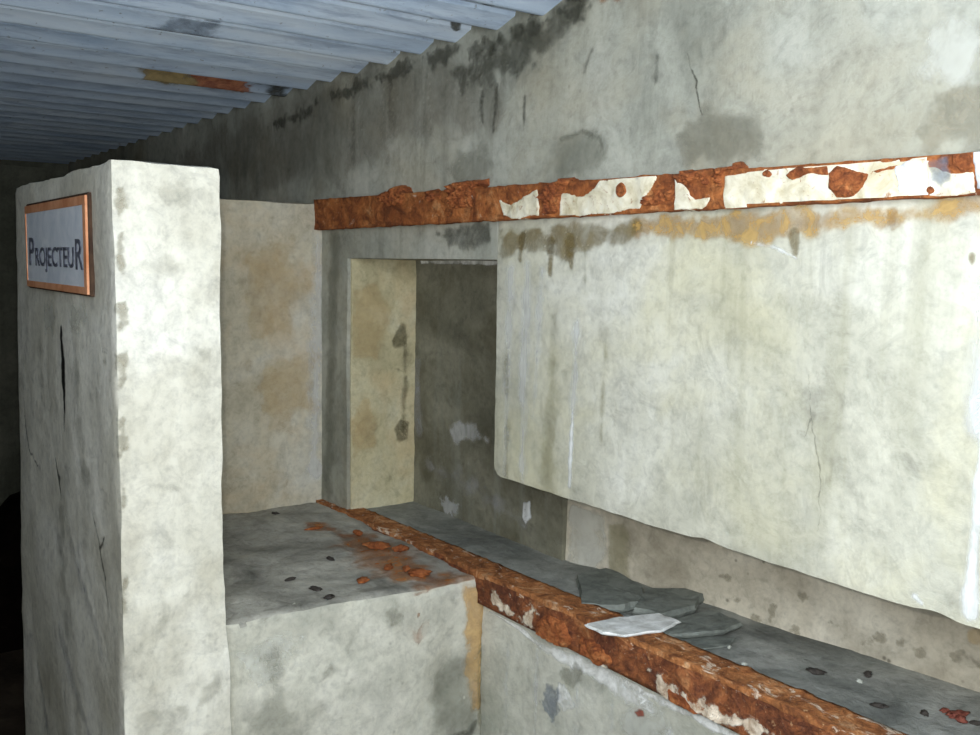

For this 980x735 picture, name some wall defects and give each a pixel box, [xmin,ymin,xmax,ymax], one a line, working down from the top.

rust [143,69,251,93]
peeling [499,190,539,220]
peeling [560,176,657,216]
rust [616,182,626,197]
peeling [674,180,710,211]
rust [786,165,897,198]
peeling [723,152,980,208]
rust [938,153,974,179]
rust [633,205,903,246]
crack [58,326,66,421]
rust [342,529,453,585]
water stain [963,460,980,619]